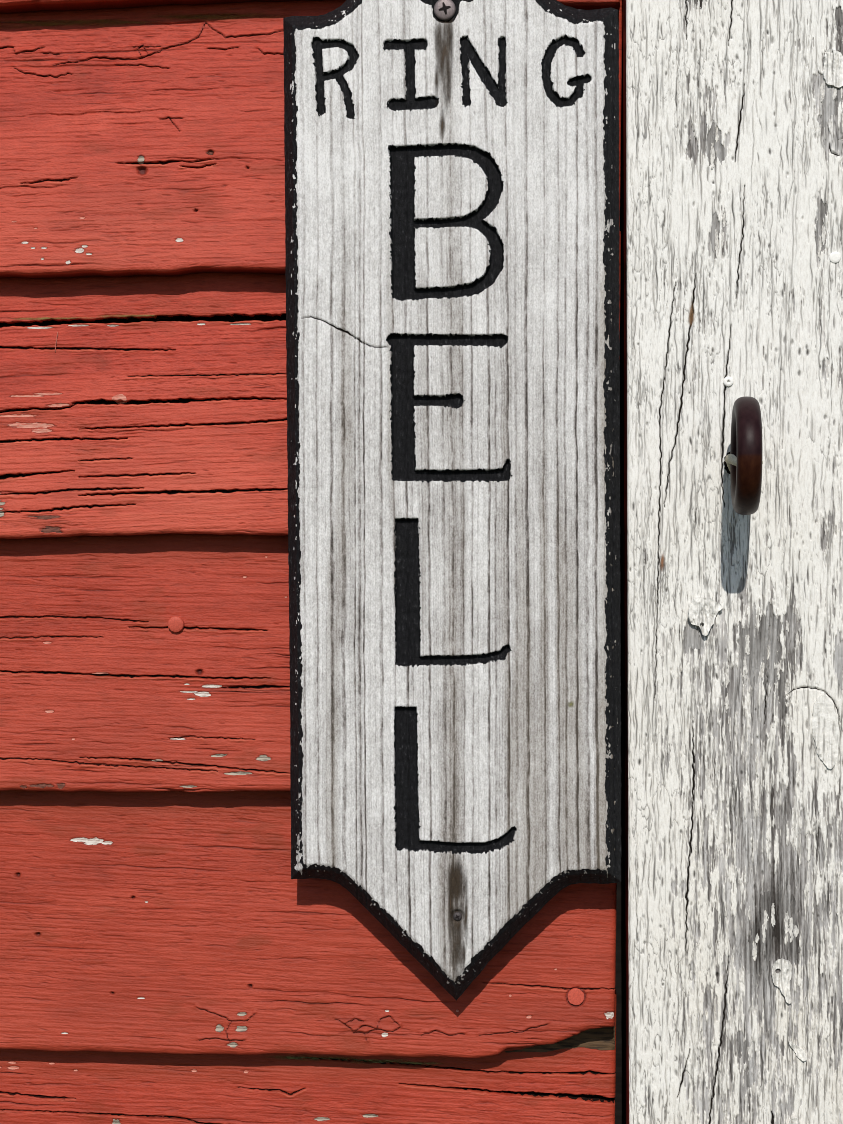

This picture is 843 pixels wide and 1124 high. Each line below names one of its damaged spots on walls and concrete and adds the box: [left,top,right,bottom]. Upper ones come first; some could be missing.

crack [0,23,283,78]
peeling [818,49,843,137]
peeling [835,6,843,36]
crack [0,314,386,513]
crack [654,276,696,698]
peeling [683,597,723,654]
peeling [724,602,799,726]
peeling [834,635,843,690]
peeling [812,695,840,769]
crack [685,727,695,950]
crack [319,1016,614,1103]
crack [709,956,729,1124]